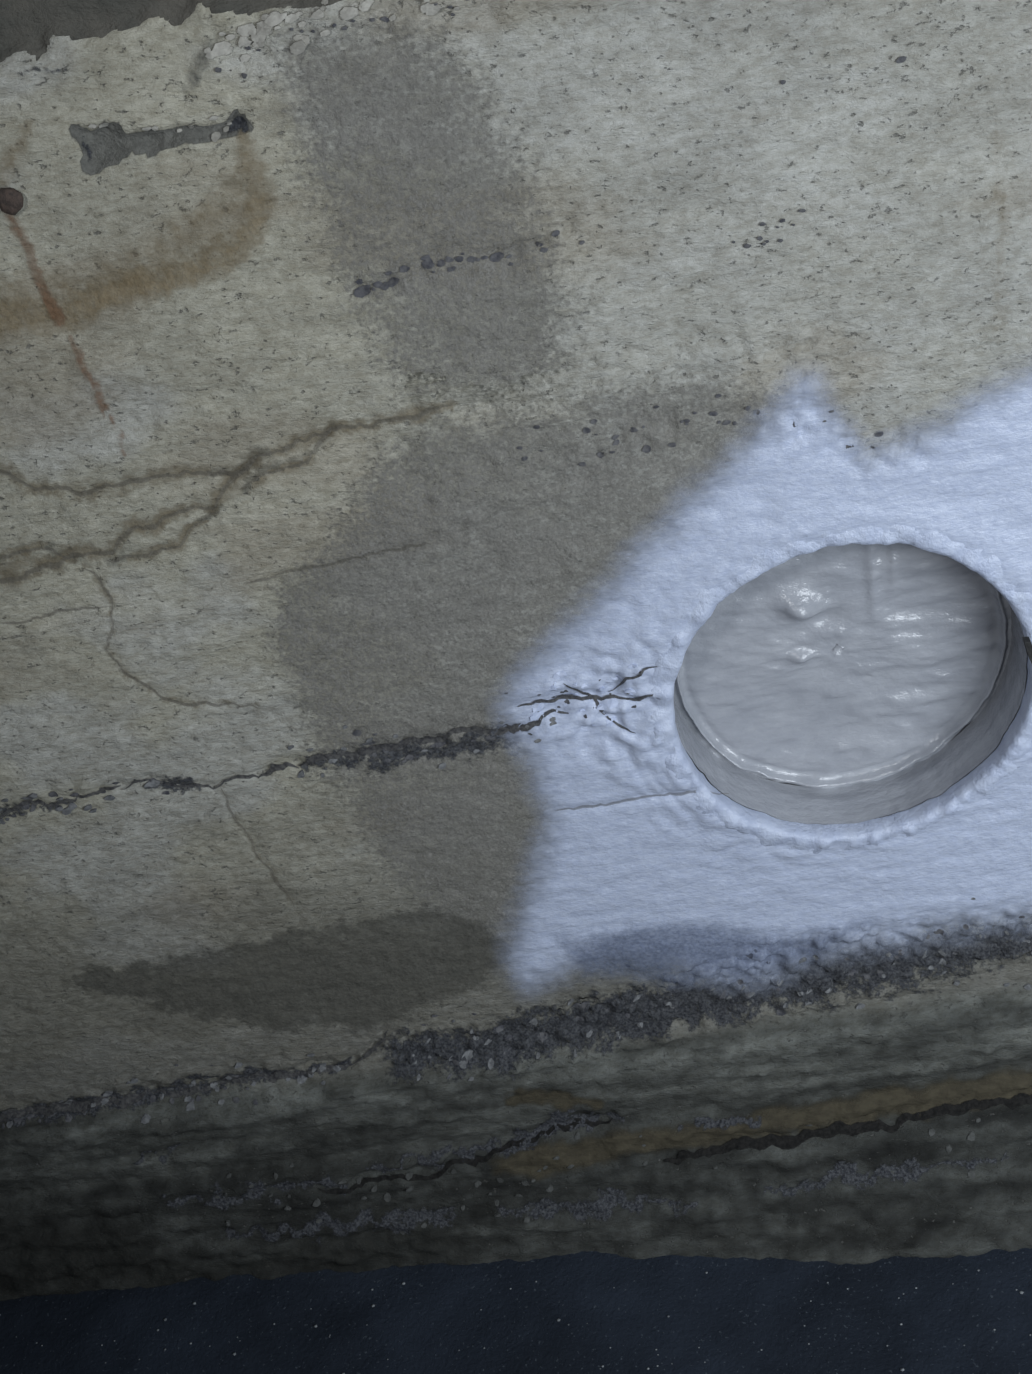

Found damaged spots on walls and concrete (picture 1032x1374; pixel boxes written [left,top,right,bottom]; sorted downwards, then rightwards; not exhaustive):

peeling [204,0,396,79]
water stain [280,19,581,393]
crack [15,407,443,570]
crack [0,664,657,824]
water stain [266,378,787,967]